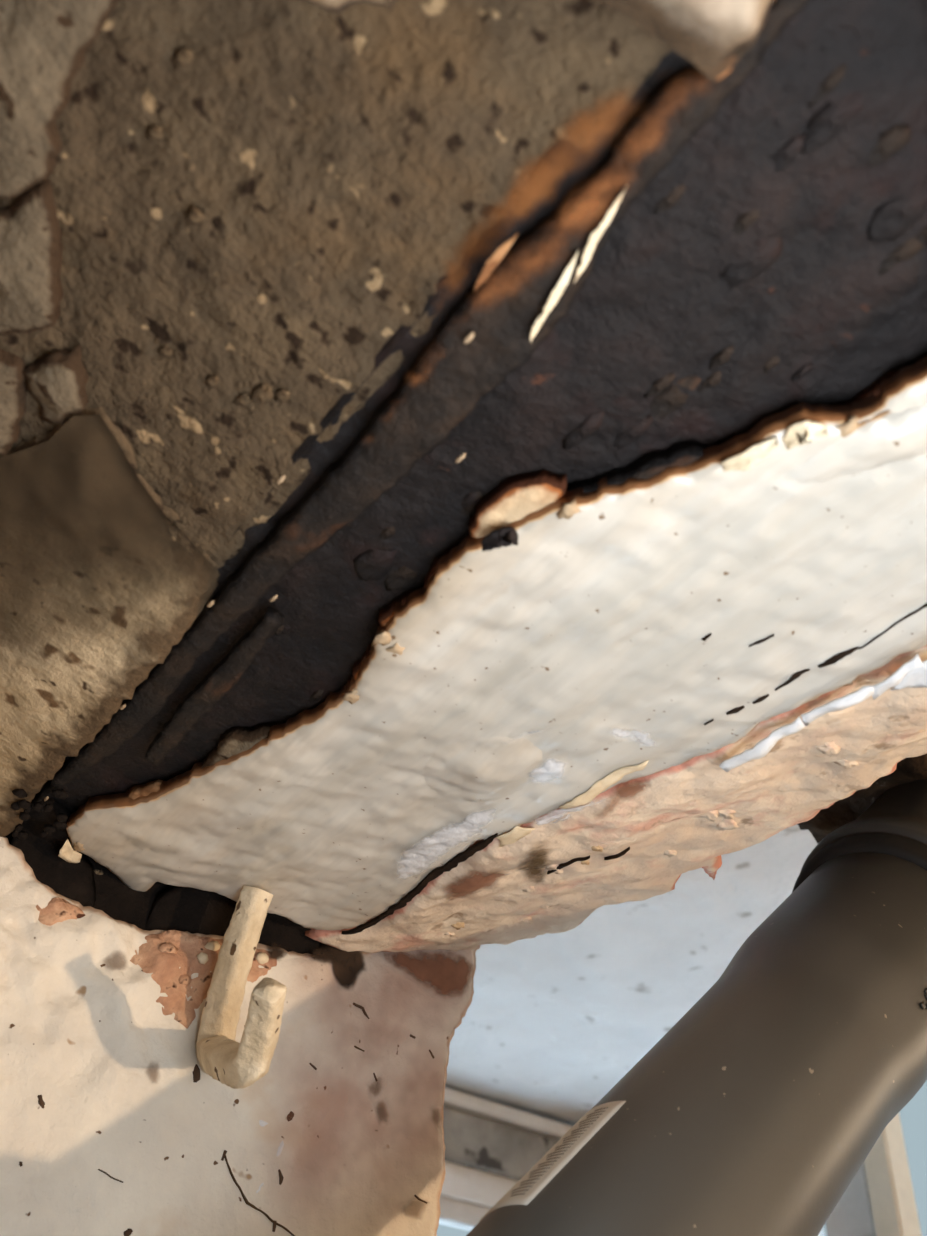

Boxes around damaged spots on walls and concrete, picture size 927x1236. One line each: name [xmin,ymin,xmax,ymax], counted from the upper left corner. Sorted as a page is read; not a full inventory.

rust [500,101,621,218]
rust [630,104,675,156]
flaking render [0,0,672,570]
rust [480,173,628,302]
peeling [721,420,829,471]
crack [704,603,927,725]
flaking render [305,645,927,953]
peeling [58,839,82,863]
flaking render [36,897,85,926]
flaking render [130,930,223,1029]
flaking render [247,948,277,983]